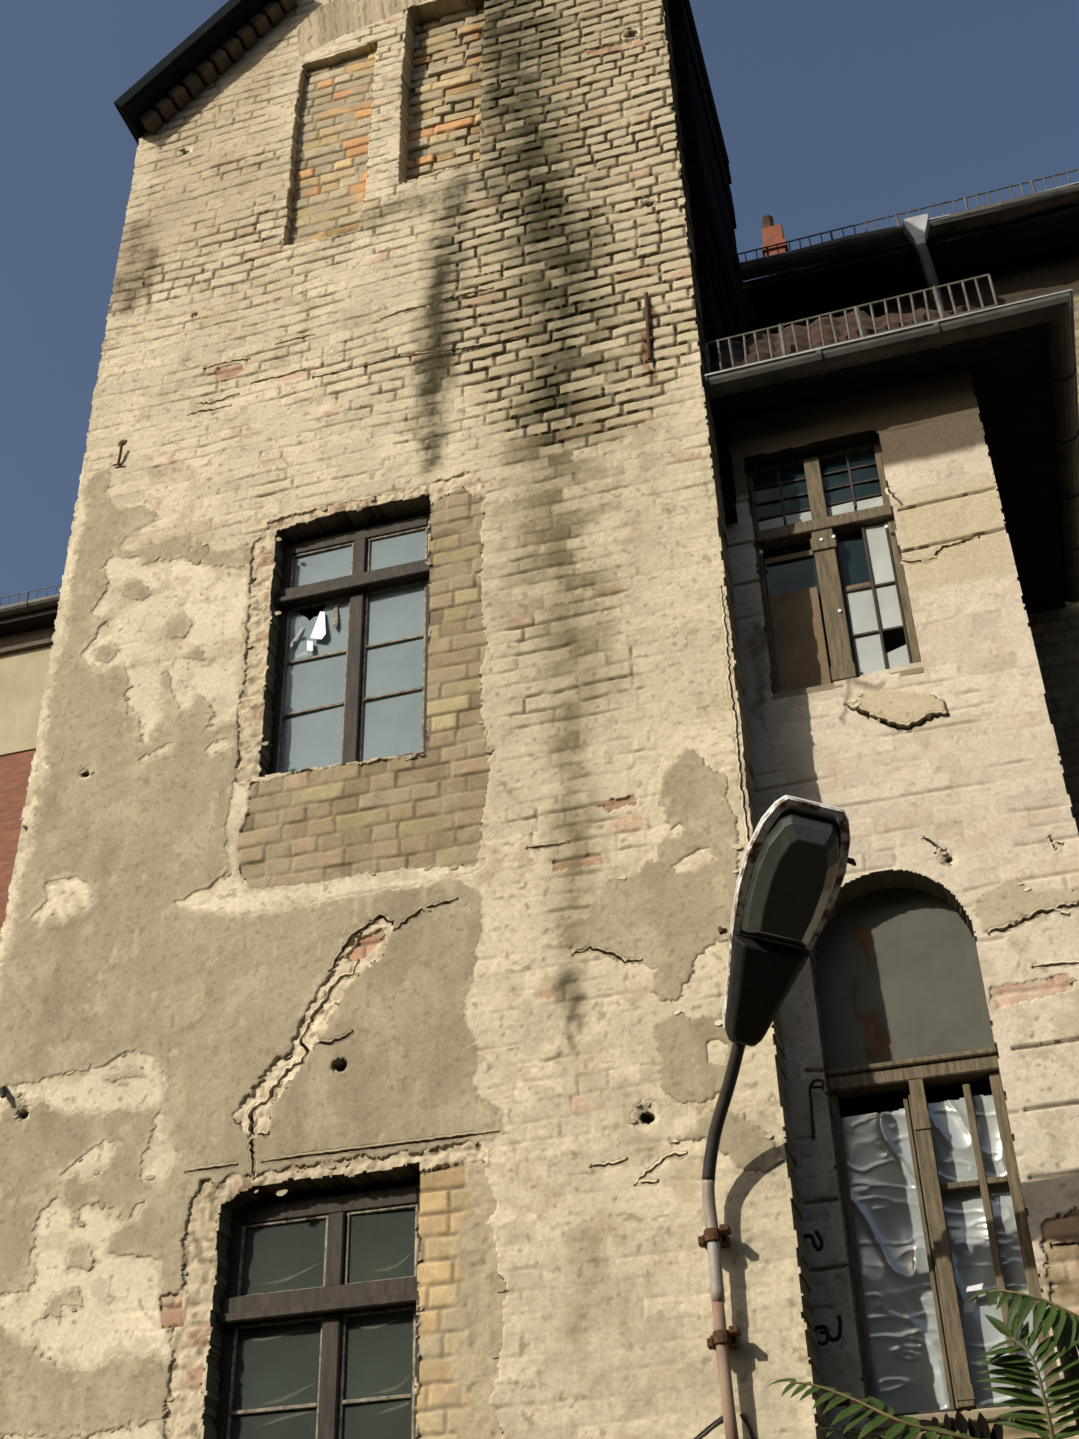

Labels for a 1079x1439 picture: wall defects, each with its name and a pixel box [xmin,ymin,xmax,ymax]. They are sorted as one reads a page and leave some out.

flaking render [0,458,94,988]
flaking render [81,543,255,765]
flaking render [174,486,494,916]
flaking render [596,796,637,812]
flaking render [848,690,949,724]
crack [186,897,499,1179]
flaking render [0,1050,184,1370]
flaking render [415,1160,508,1439]
flaking render [1040,1208,1079,1315]
flaking render [0,1420,170,1439]
flaking render [842,1420,1050,1439]